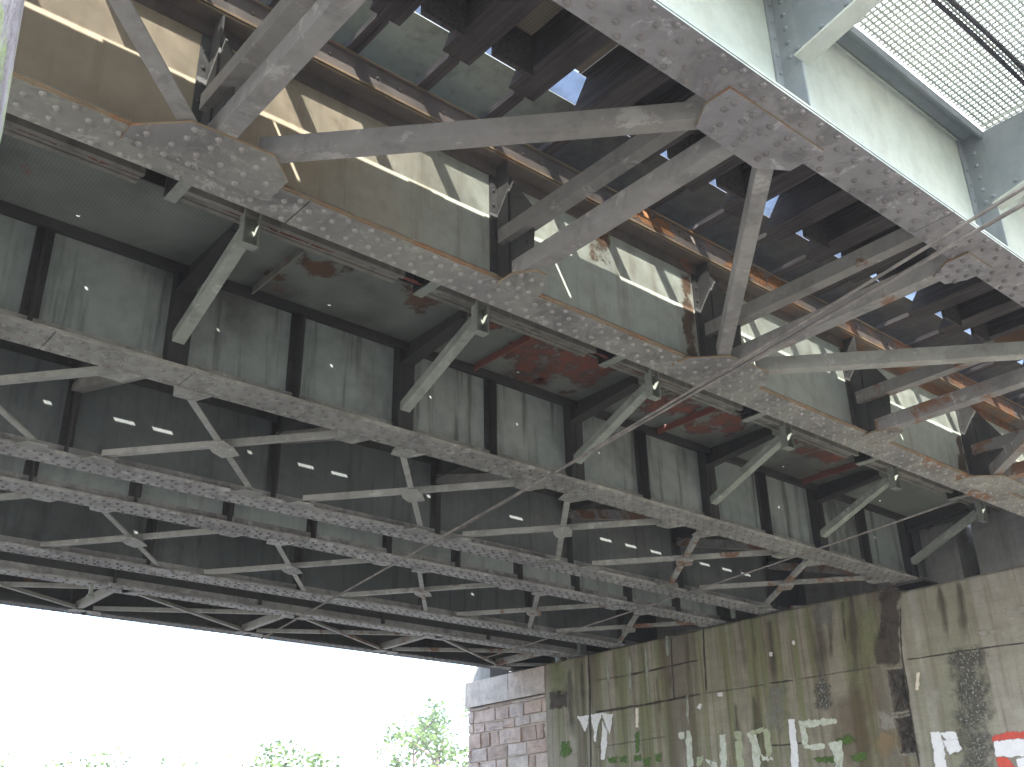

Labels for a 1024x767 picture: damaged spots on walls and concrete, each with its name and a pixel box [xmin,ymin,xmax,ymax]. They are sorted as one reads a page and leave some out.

corrosion [262,224,373,278]
corrosion [590,233,610,261]
corrosion [633,210,679,237]
corrosion [403,277,442,314]
corrosion [682,276,698,357]
water stain [874,585,901,665]
water stain [815,597,857,709]